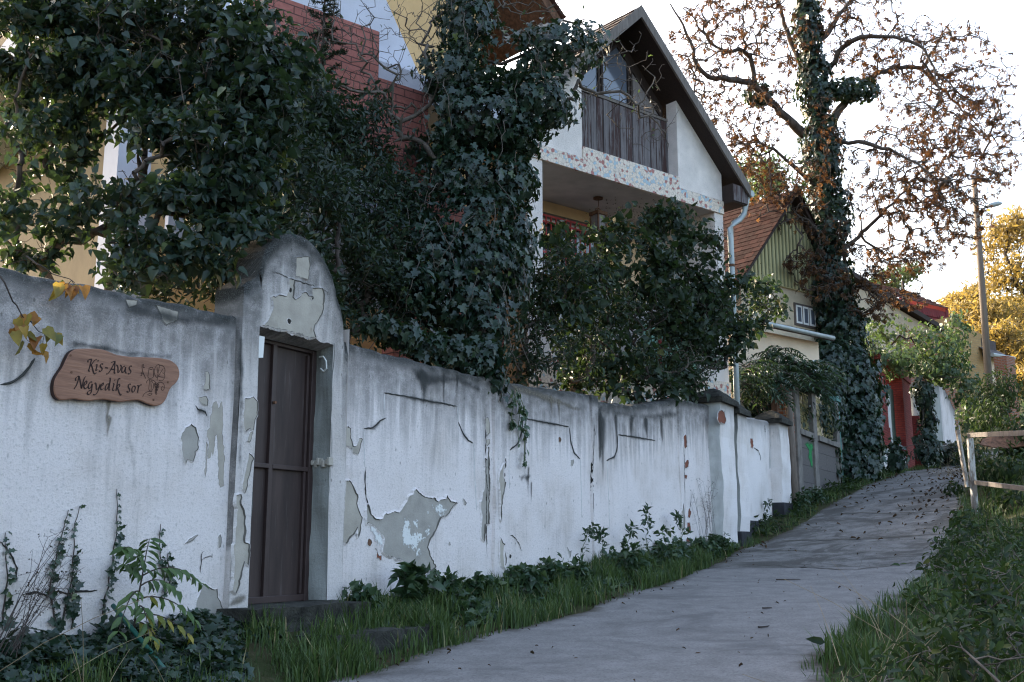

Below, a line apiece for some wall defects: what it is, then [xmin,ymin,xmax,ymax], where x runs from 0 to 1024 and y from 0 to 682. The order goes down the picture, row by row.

flaking render [262,255,325,340]
water stain [417,369,479,395]
water stain [599,408,671,461]
flaking render [179,371,258,615]
flaking render [343,416,506,573]